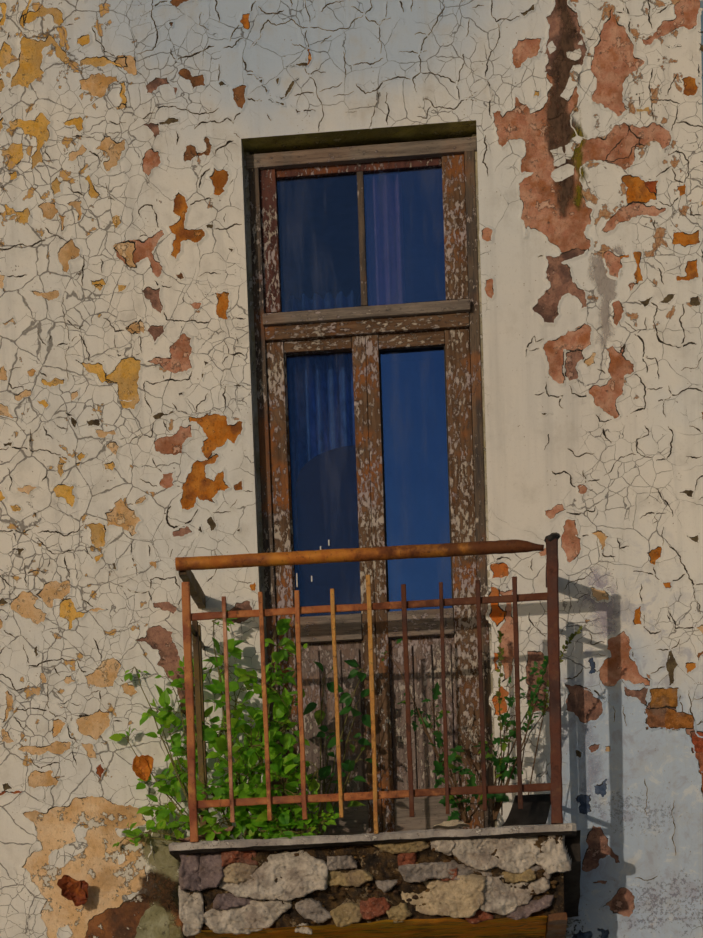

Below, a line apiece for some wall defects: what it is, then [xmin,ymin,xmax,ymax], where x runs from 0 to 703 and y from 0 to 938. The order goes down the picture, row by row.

crack [6,255,144,392]
peeling [70,189,215,413]
crack [63,0,521,238]
damp [546,0,585,217]
peeling [491,0,703,422]
crack [117,370,253,607]
peeling [151,409,246,541]
crack [535,266,703,727]
crack [0,523,136,770]
flaking render [562,602,703,803]
spalling [19,793,183,938]
damp [138,872,180,914]